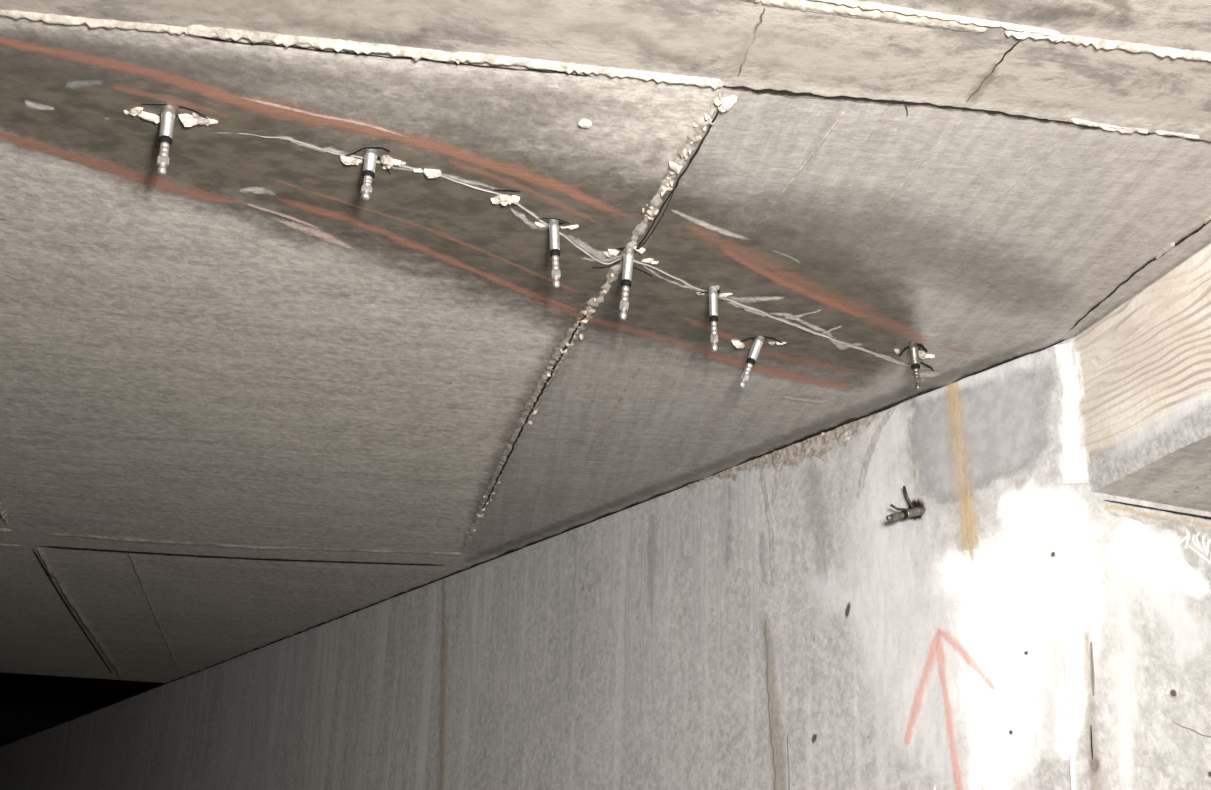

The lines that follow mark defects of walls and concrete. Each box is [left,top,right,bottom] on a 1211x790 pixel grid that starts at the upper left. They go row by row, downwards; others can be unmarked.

damp [0,39,912,384]
crack [723,8,1211,143]
crack [47,133,1211,730]
crack [1174,722,1211,738]